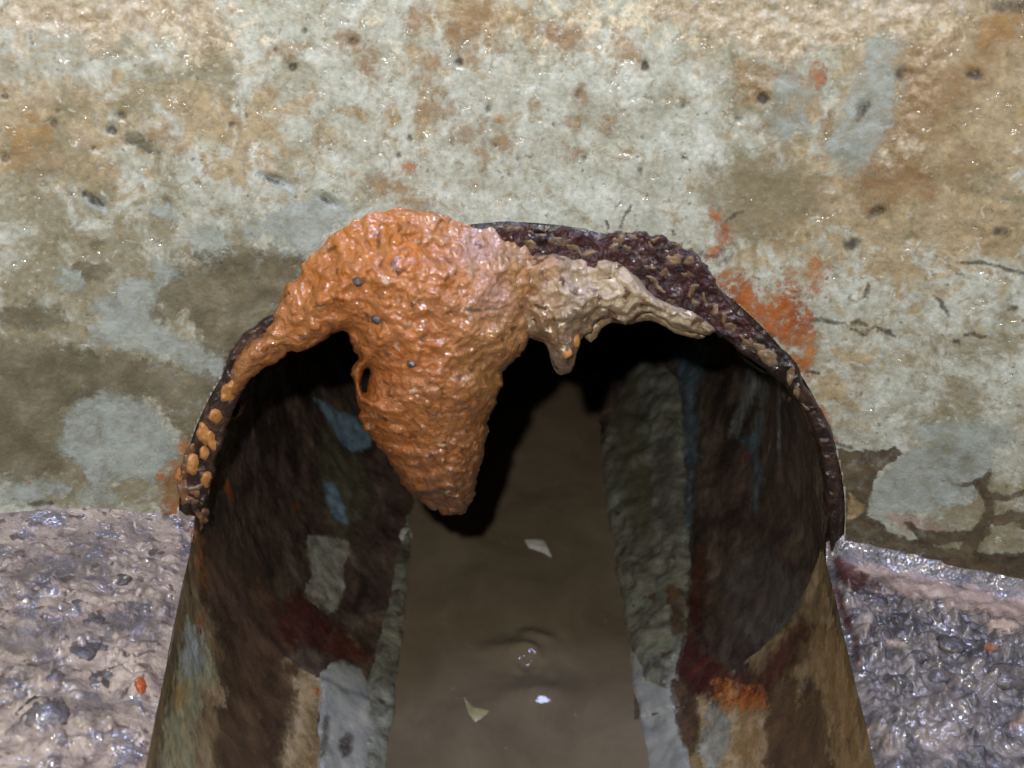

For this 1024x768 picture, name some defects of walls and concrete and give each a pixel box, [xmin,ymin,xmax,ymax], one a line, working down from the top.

water stain [0,304,219,488]
water stain [150,244,304,358]
corrosion [223,179,532,516]
corrosion [709,209,733,258]
corrosion [717,259,820,376]
crack [812,318,892,336]
crack [936,297,948,314]
crack [953,332,985,343]
crack [956,260,1024,275]
corrosion [673,547,814,712]